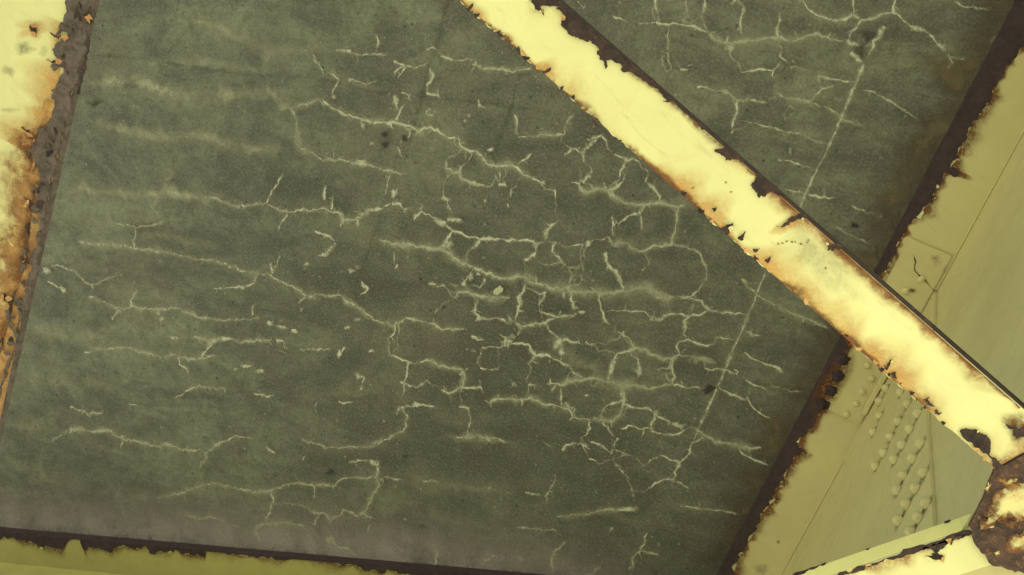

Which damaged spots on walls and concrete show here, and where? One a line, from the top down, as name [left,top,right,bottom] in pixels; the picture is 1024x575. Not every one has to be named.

rust [0,0,99,444]
damp [102,75,191,99]
damp [0,497,595,575]
crack [43,4,825,571]
rust [629,146,935,575]
crack [613,0,953,211]
rust [769,46,1024,558]
peeling [873,360,926,409]
crack [923,397,942,415]
damp [854,0,1015,272]
peeling [960,428,1003,470]
peeling [1006,424,1024,439]